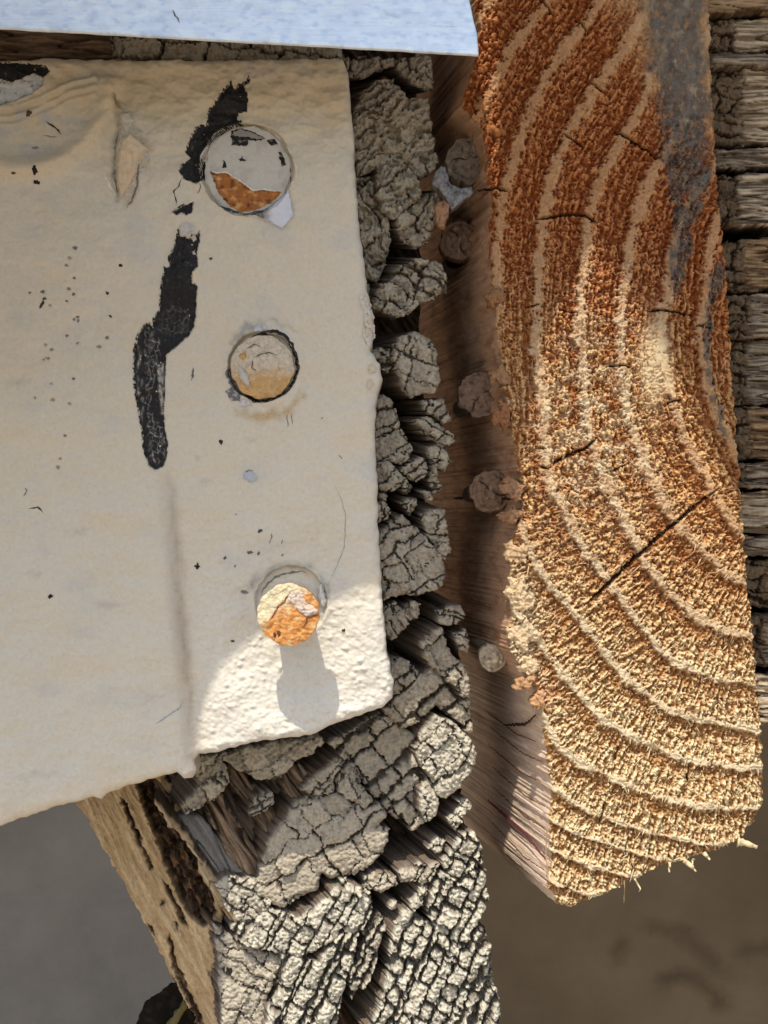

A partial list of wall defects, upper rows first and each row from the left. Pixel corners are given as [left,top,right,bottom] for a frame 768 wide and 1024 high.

peeling [0,61,49,105]
corrosion [210,171,281,212]
peeling [132,76,298,470]